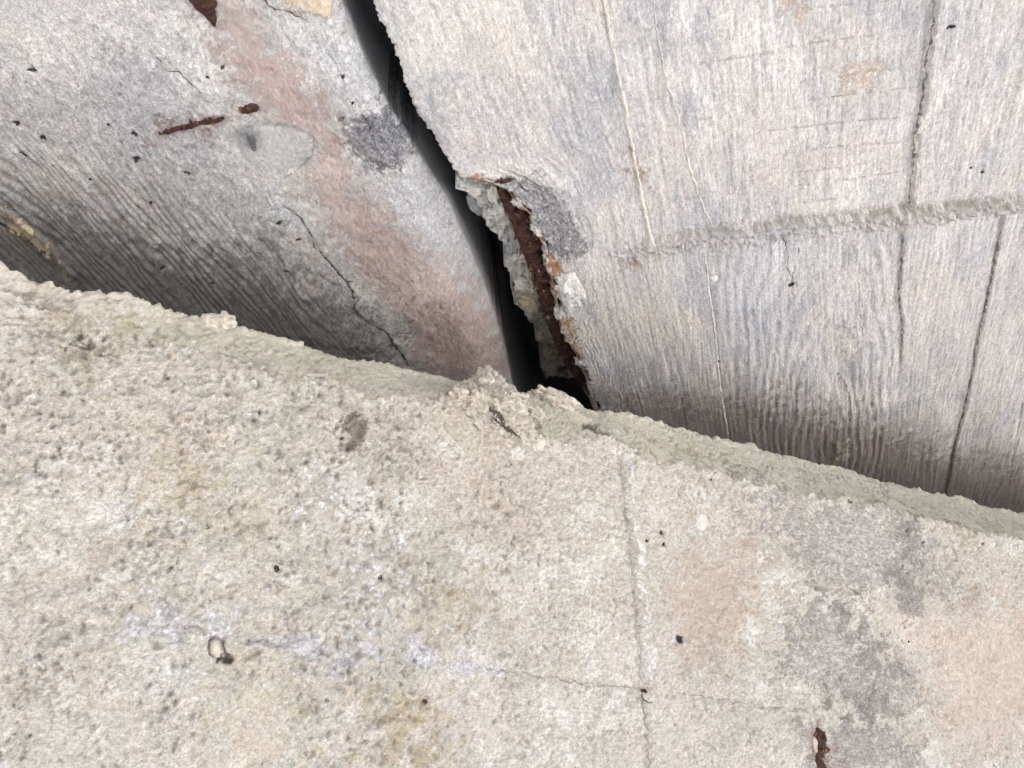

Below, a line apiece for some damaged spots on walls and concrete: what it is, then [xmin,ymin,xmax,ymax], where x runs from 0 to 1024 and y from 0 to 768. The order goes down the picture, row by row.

crack [266,196,419,367]
corrosion [209,0,510,382]
spalling [455,170,599,411]
corrosion [544,252,584,360]
crack [110,448,656,768]
crack [683,692,810,713]